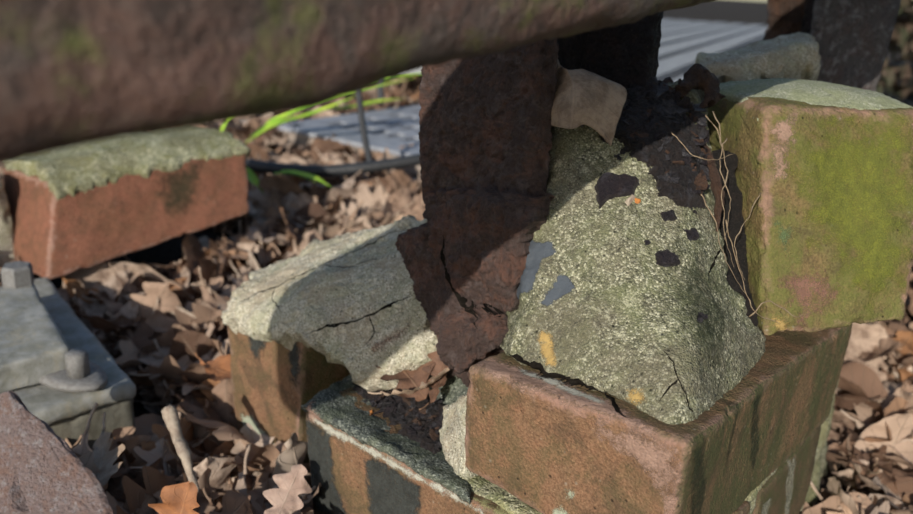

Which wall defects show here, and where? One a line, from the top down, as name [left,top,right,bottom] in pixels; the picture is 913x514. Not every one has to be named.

crack [304,295,412,345]
crack [659,350,695,417]
water stain [306,416,466,514]